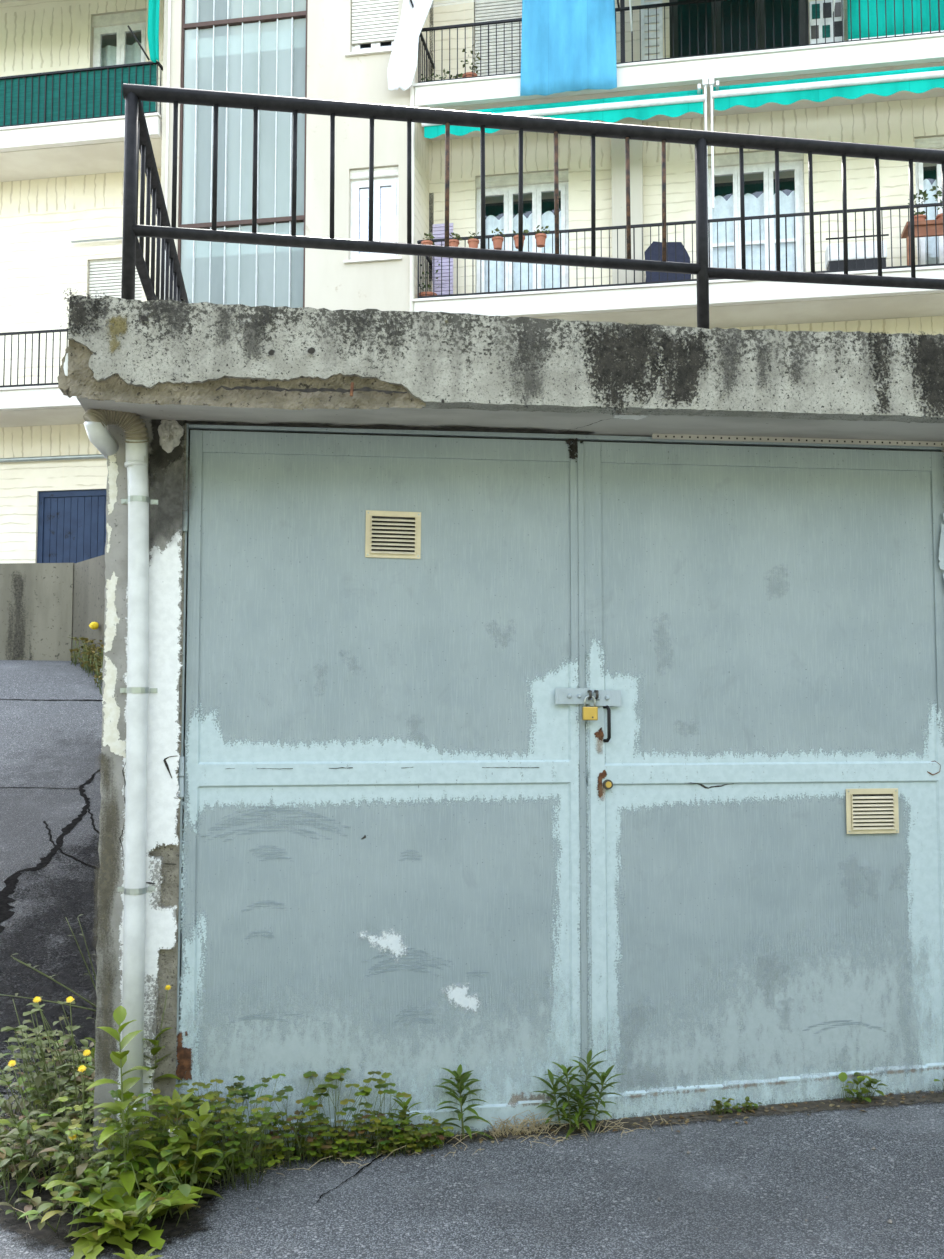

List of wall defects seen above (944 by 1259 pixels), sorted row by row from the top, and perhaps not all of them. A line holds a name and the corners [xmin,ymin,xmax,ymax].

leakage [60,288,108,336]
leakage [139,296,190,339]
spalling [63,340,426,410]
leakage [215,308,277,362]
leakage [510,330,550,408]
leakage [579,323,740,415]
leakage [756,342,772,389]
leakage [789,350,803,383]
leakage [868,331,944,419]
crack [0,763,126,933]